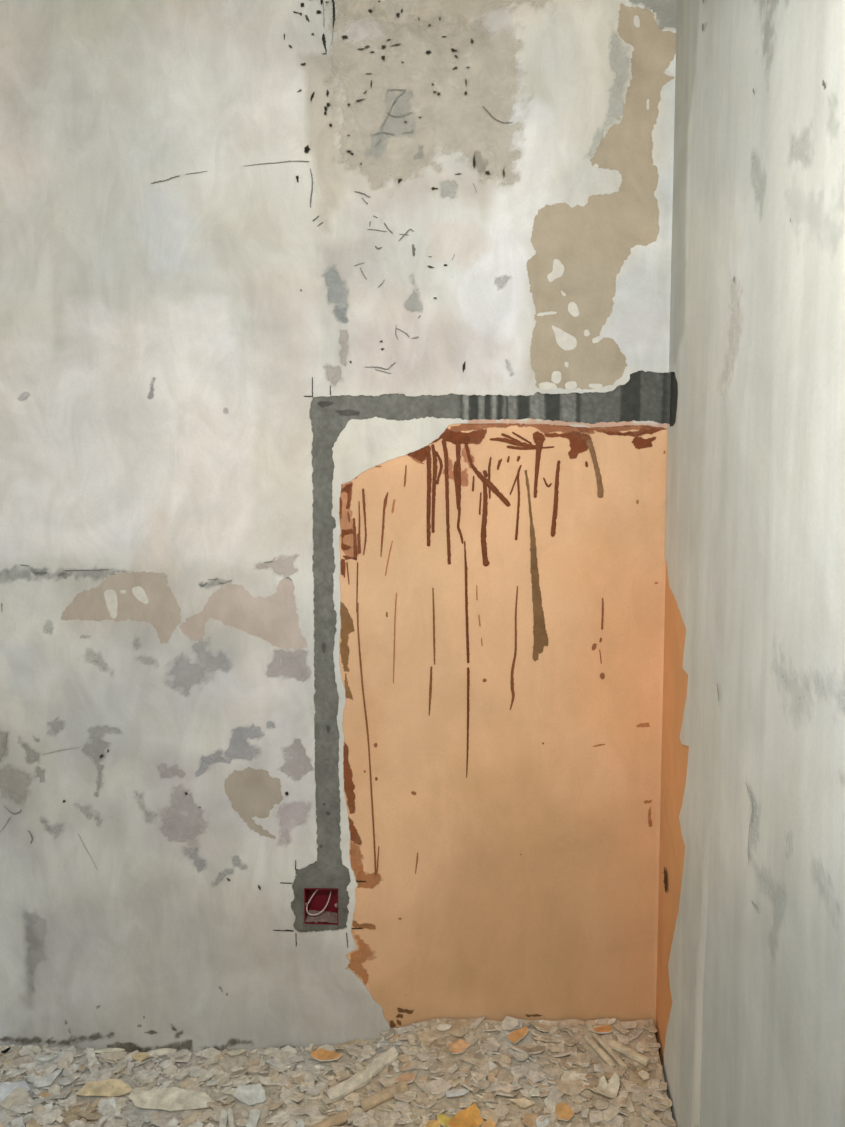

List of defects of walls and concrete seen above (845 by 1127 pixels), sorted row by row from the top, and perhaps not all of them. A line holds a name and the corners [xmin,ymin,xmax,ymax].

crack [322,0,336,54]
spalling [341,35,401,61]
crack [151,171,207,184]
crack [246,160,323,226]
peeling [526,4,676,390]
corrosion [407,423,666,486]
peeling [61,571,308,650]
peeling [339,423,689,1081]
peeling [224,767,289,839]